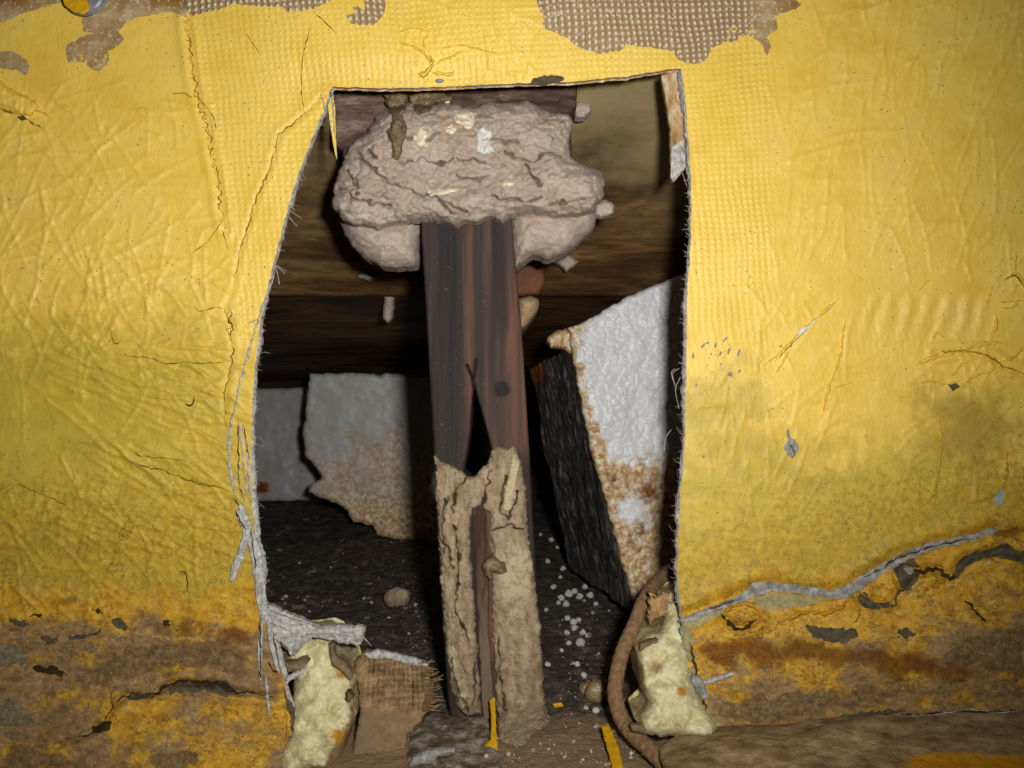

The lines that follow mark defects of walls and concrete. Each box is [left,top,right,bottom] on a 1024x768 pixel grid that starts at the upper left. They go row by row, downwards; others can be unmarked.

peeling [0,0,63,22]
peeling [65,0,330,71]
peeling [346,0,386,26]
peeling [537,0,801,64]
peeling [529,75,565,85]
crack [110,100,319,427]
spalling [545,328,571,355]
crack [940,350,1020,373]
crack [679,527,1024,675]
peeling [328,641,355,702]
crack [59,679,275,746]
peeling [485,697,498,751]